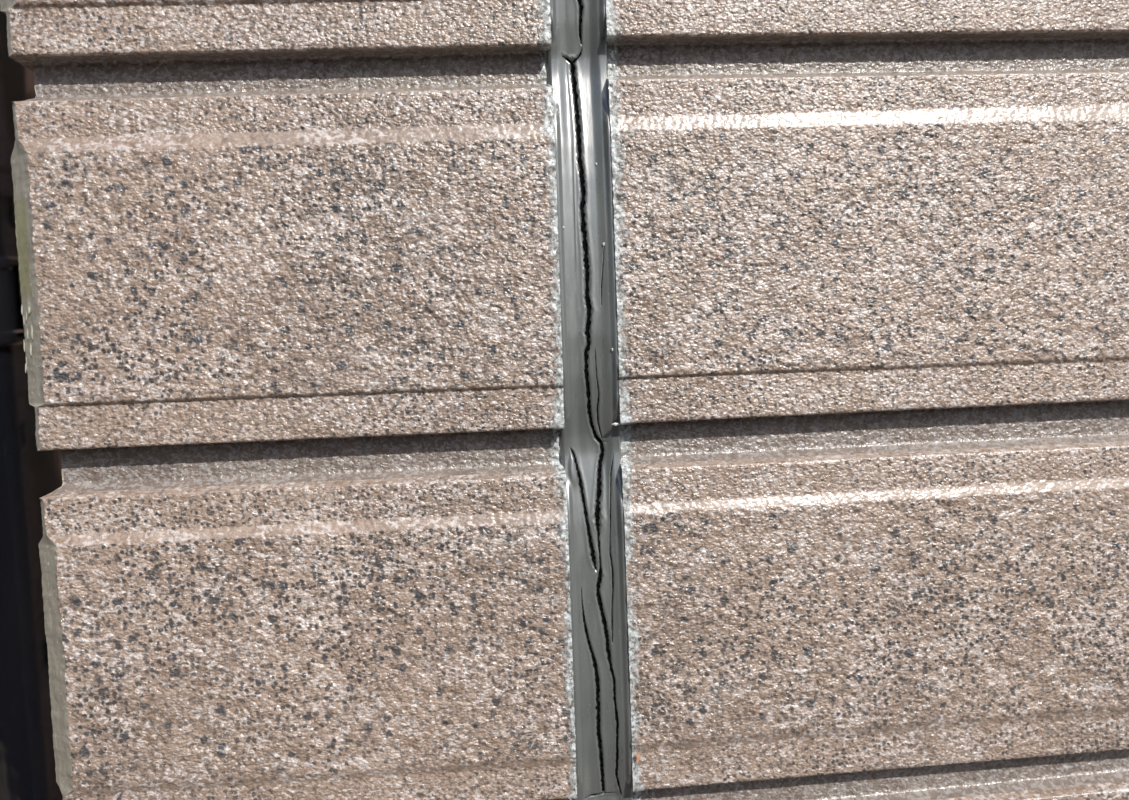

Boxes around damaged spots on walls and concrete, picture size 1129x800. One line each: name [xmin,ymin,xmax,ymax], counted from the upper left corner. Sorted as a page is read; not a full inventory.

crack [562,0,622,798]